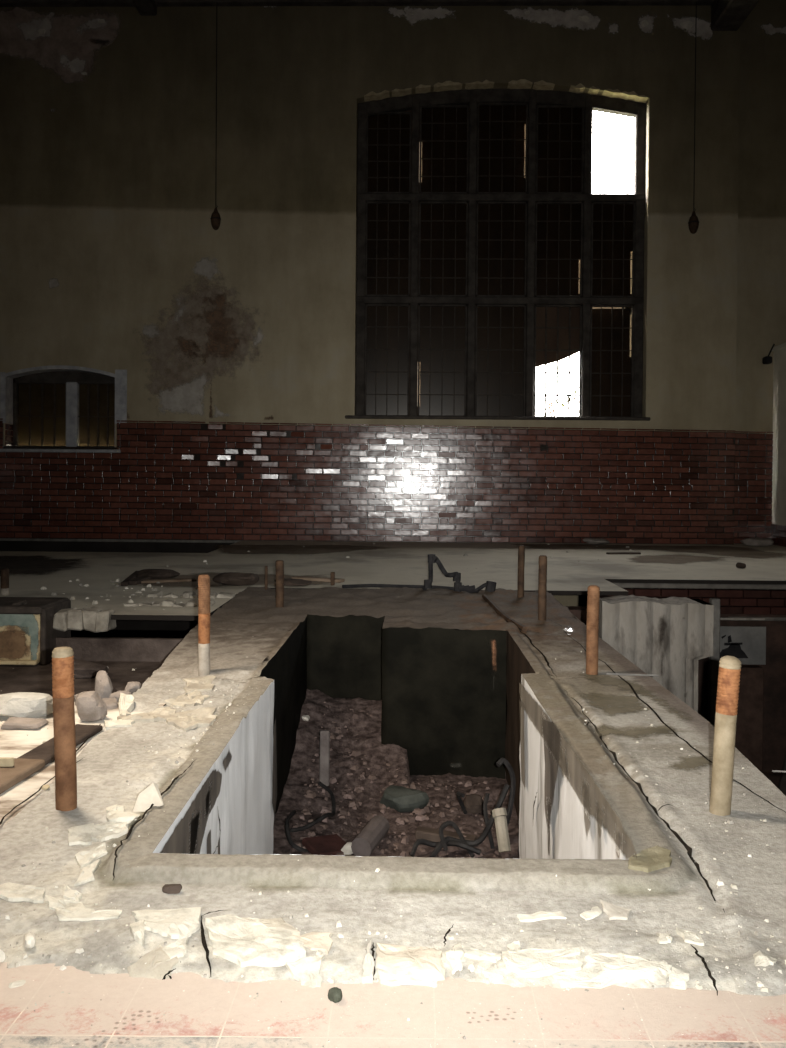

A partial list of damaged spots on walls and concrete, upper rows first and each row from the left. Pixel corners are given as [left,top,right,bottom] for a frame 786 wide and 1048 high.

peeling [0,7,119,83]
peeling [389,6,454,25]
peeling [504,7,618,34]
peeling [639,15,713,40]
damp [143,258,263,418]
crack [113,760,195,880]
crack [513,622,725,913]
crack [733,779,785,812]
spalling [0,804,333,988]
crack [201,910,223,975]
crack [690,944,718,996]